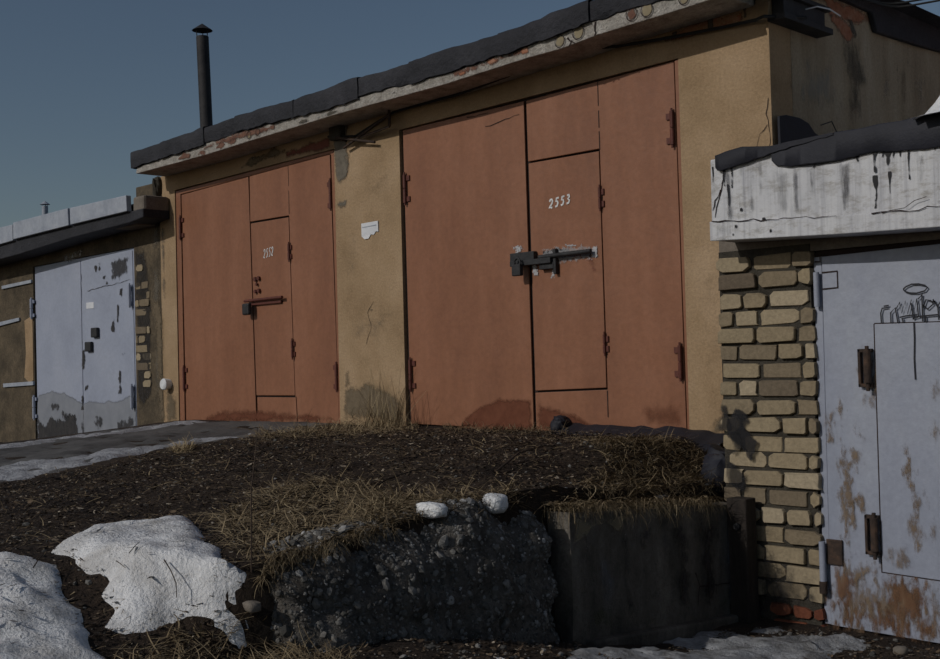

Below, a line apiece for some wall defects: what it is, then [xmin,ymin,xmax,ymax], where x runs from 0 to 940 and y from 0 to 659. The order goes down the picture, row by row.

leakage [712,167,732,217]
leakage [842,156,859,205]
leakage [872,150,910,209]
peeling [37,253,160,437]
leakage [344,379,400,423]
corrosion [459,400,587,430]
corrosion [837,450,864,543]
corrosion [826,523,938,639]